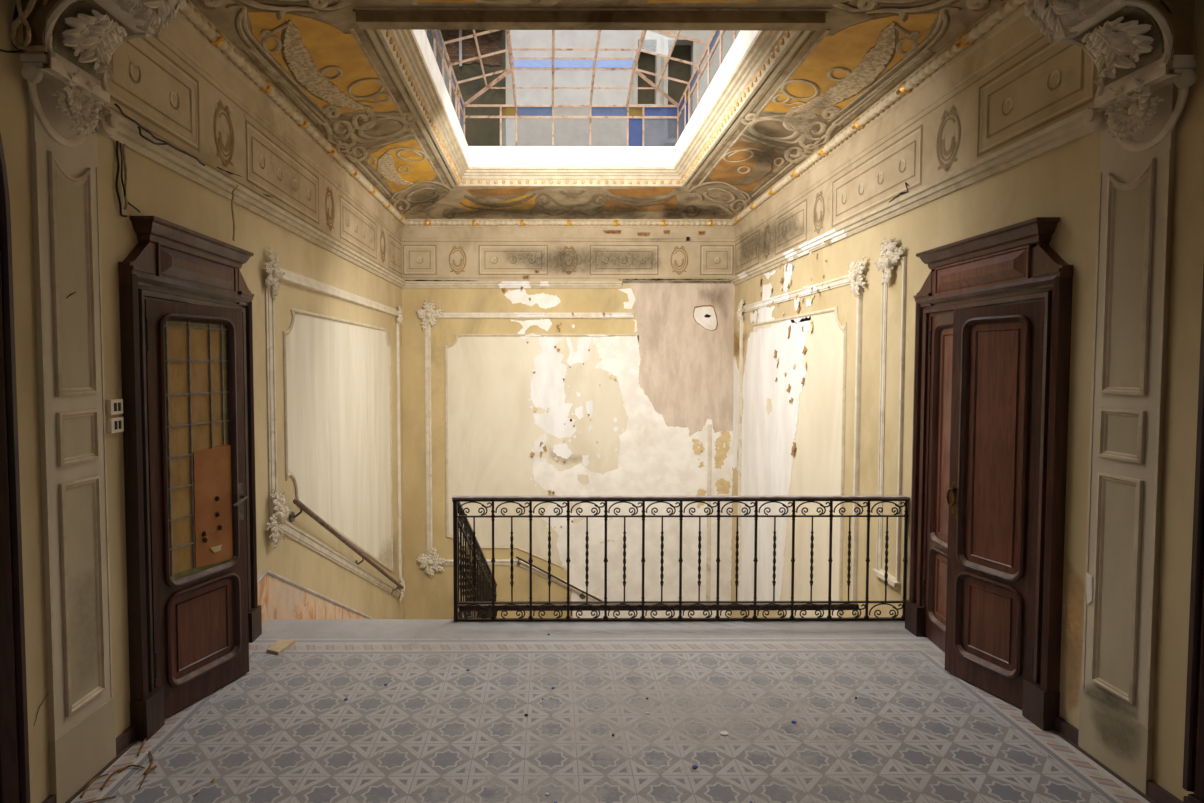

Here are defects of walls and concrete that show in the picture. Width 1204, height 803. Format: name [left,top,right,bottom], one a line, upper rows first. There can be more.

peeling [498,229,848,618]